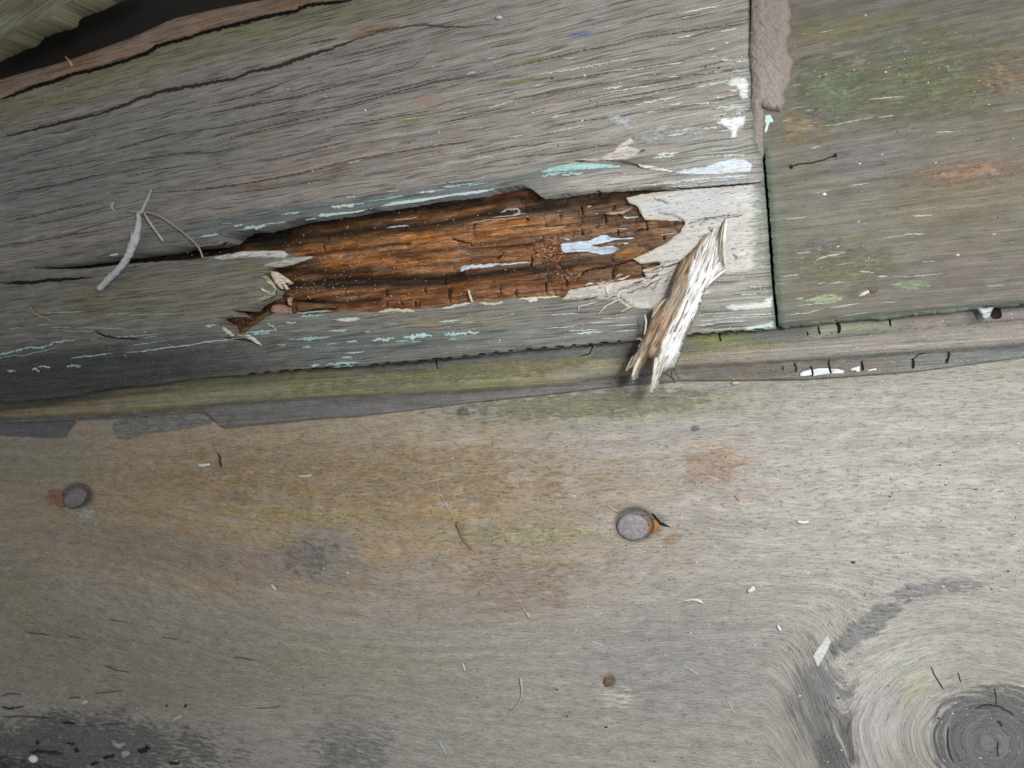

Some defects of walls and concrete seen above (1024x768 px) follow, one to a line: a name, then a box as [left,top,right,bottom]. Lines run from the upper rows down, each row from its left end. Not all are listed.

crack [0,0,352,100]
crack [2,23,739,247]
spalling [0,27,868,368]
crack [1,277,91,285]
peeling [797,251,943,278]